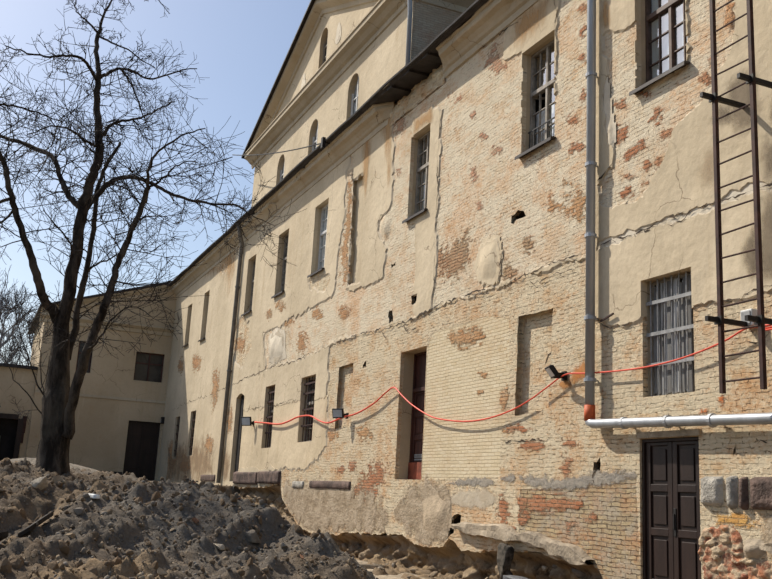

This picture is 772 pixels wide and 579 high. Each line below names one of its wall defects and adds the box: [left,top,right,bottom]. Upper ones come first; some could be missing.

leakage [718,79,750,126]
crack [601,183,772,245]
leakage [744,199,772,276]
peeling [226,0,772,579]
crack [696,285,772,306]
crack [175,253,581,409]
spalling [211,367,219,415]